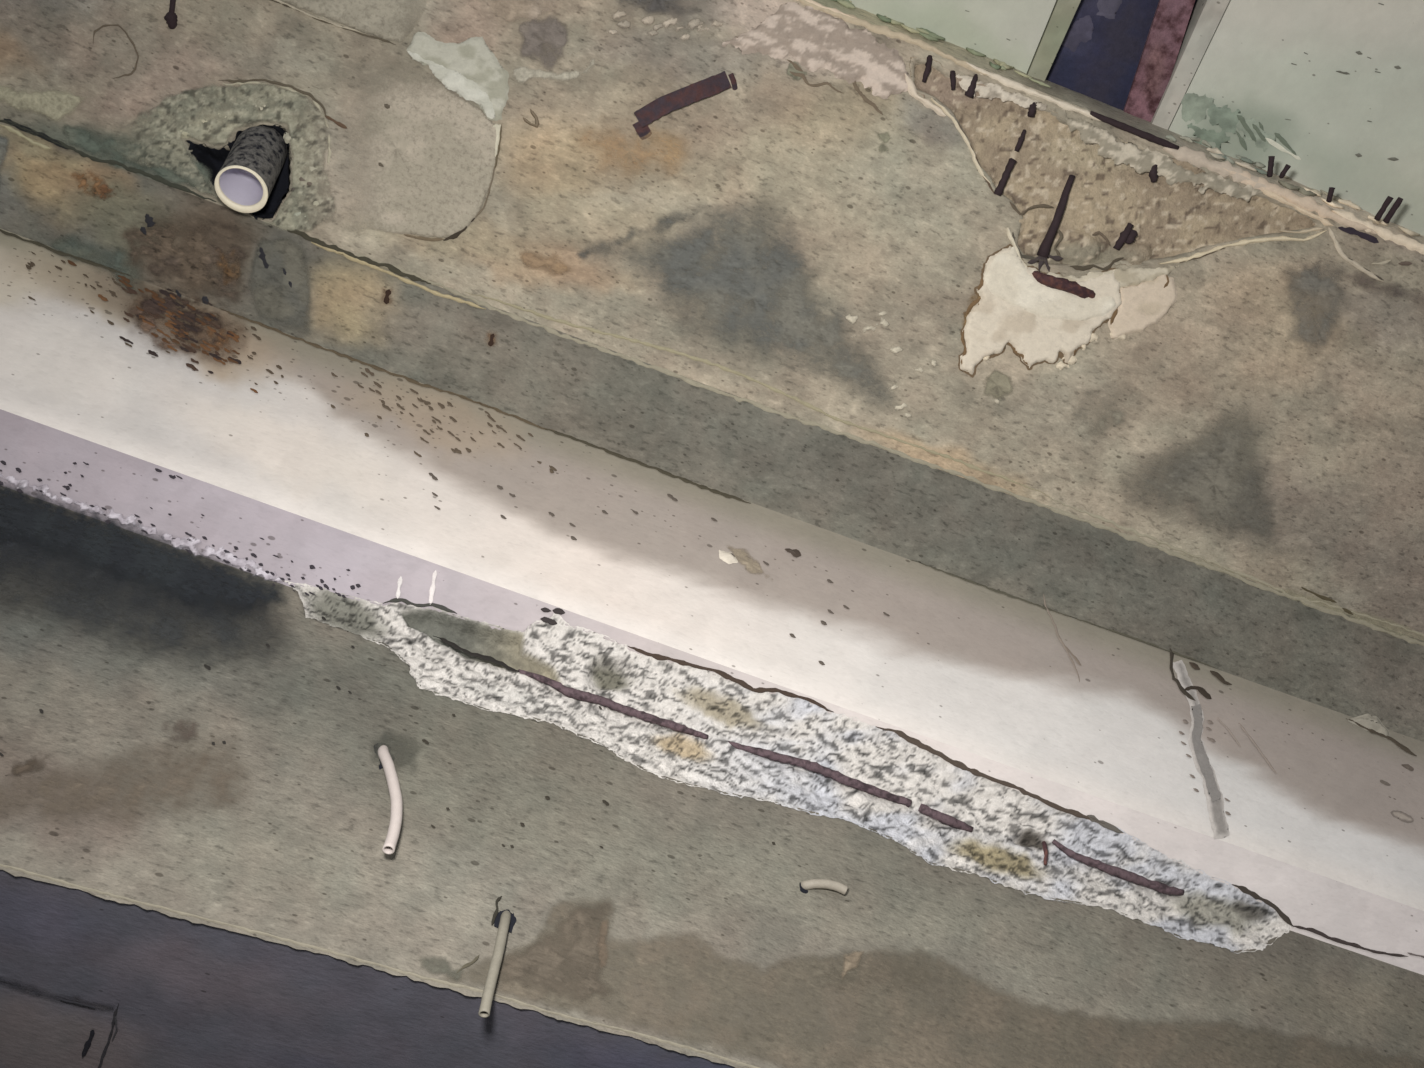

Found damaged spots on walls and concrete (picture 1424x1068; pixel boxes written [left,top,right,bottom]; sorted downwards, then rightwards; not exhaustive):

spalling [0,460,89,496]
crack [0,229,131,276]
water stain [0,474,281,656]
corrosion [118,214,292,374]
crack [219,308,751,504]
water stain [639,209,912,417]
spalling [722,0,1424,378]
spalling [172,532,1294,954]
crack [911,560,1277,839]
crack [1293,925,1424,958]